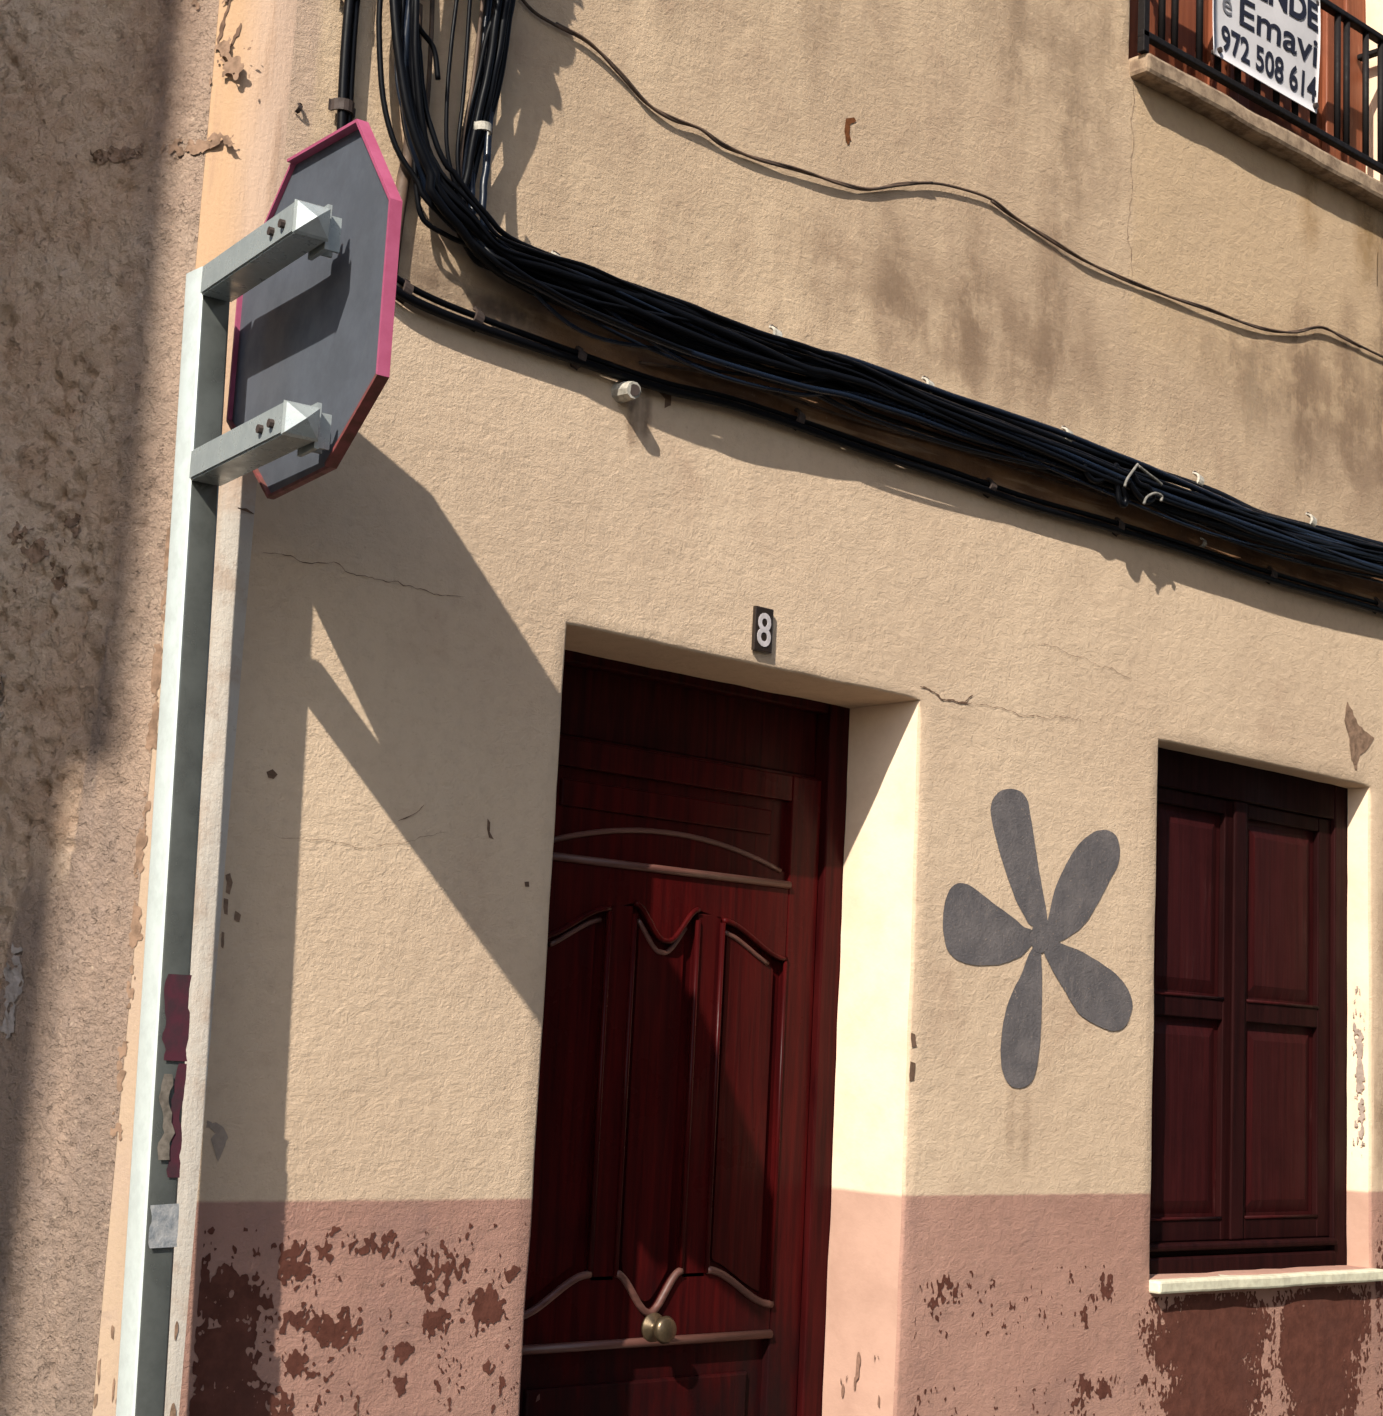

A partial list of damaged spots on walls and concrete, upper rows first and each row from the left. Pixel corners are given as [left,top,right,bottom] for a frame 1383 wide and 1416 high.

crack [216,0,242,55]
crack [264,552,461,597]
crack [920,686,1083,721]
peeling [1344,702,1374,770]
peeling [170,1223,521,1416]
peeling [914,1265,1115,1339]
peeling [1016,1240,1383,1416]
flaking render [94,1358,117,1409]
peeling [840,1352,879,1398]